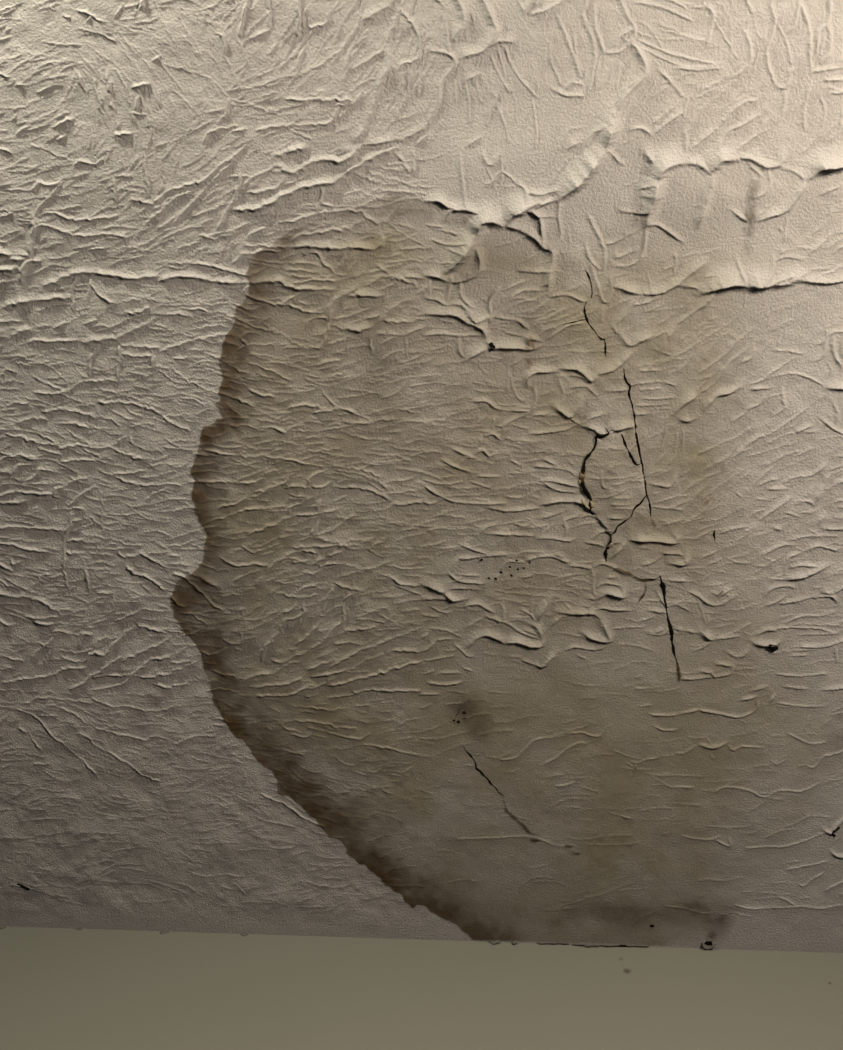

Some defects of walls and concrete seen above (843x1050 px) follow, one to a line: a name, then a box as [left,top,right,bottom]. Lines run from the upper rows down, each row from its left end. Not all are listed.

leakage [191,324,243,551]
crack [563,269,681,682]
leakage [171,570,490,939]
crack [464,748,540,842]